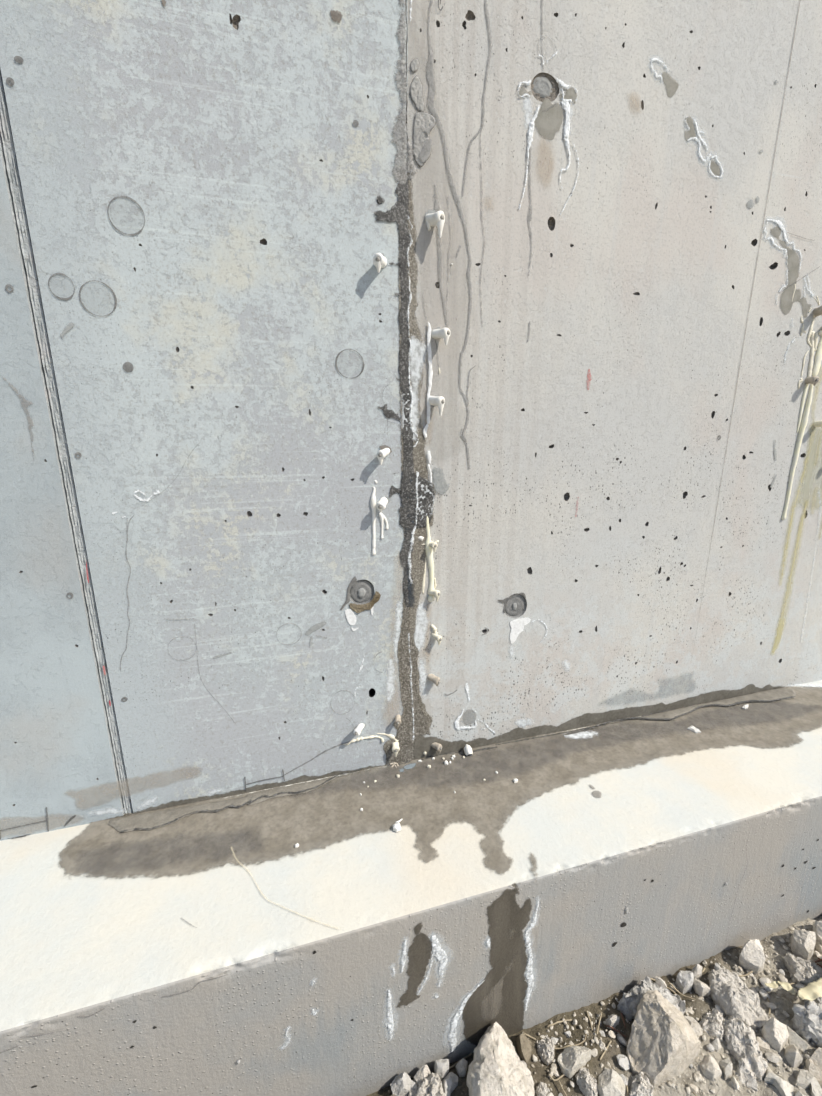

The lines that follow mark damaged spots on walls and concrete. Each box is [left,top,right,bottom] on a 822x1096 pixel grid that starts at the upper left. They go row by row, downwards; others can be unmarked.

damp [59,172,822,879]
damp [385,923,447,1038]
damp [448,883,539,1052]